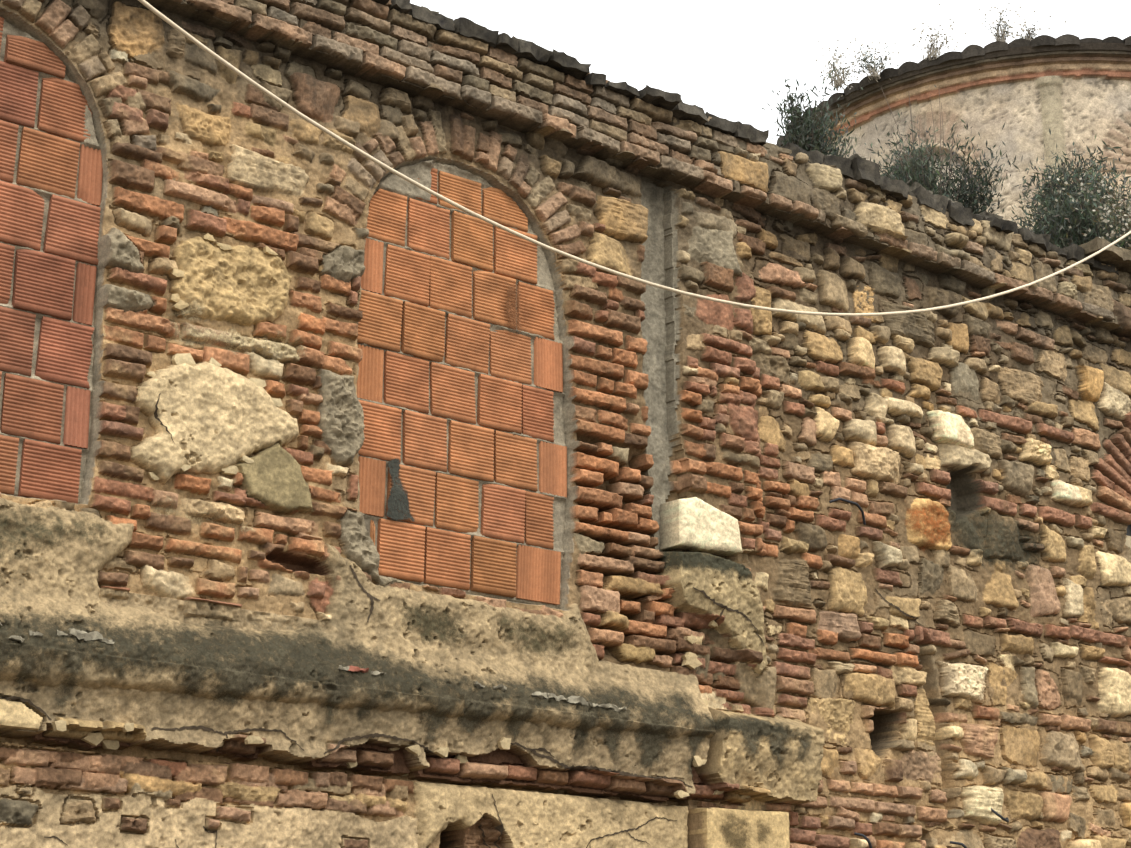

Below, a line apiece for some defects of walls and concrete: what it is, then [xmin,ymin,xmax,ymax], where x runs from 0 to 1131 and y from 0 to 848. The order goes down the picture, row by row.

hole [265,548,333,575]
crack [693,587,764,646]
crack [0,696,52,720]
flaking render [211,734,273,758]
crack [586,817,677,848]